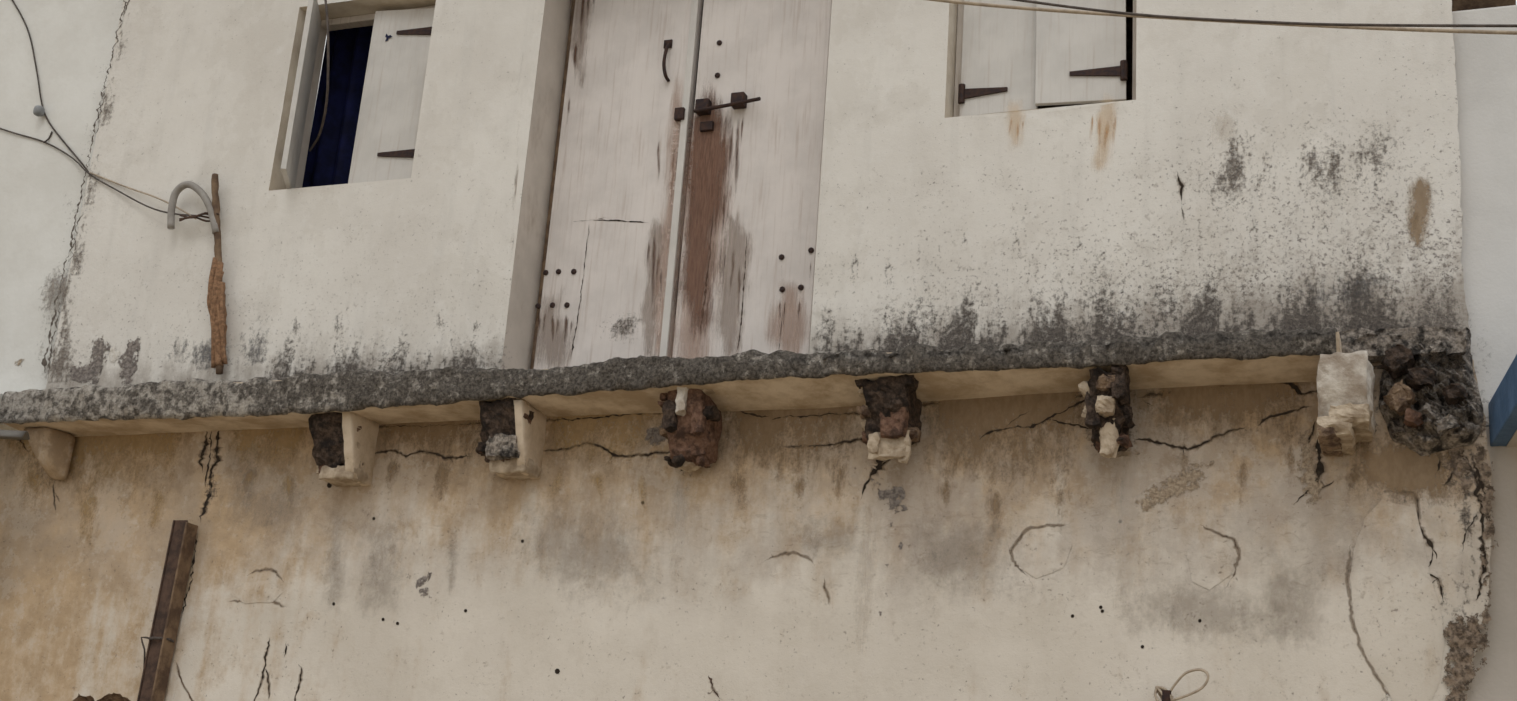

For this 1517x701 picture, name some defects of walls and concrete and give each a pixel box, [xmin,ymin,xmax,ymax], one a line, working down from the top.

crack [40,0,130,382]
leakage [814,268,1459,354]
crack [376,423,479,466]
crack [545,413,670,462]
crack [980,395,1089,439]
crack [1136,382,1334,505]
crack [183,431,220,611]
spalling [1379,341,1498,701]
crack [1399,453,1486,602]
crack [234,569,302,701]
spalling [73,693,130,701]